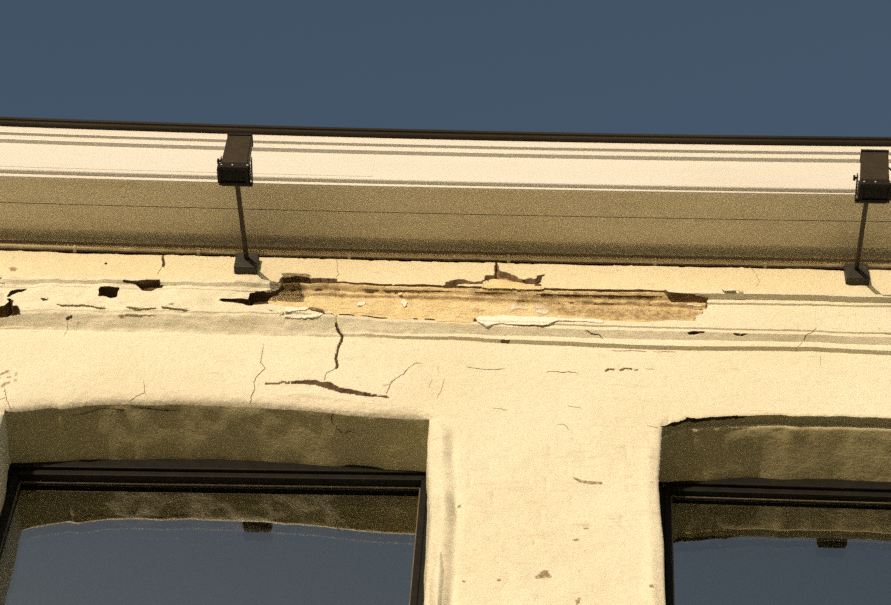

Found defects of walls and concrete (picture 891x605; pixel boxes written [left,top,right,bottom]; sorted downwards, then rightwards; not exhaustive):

spalling [250,268,706,327]
crack [325,315,343,375]
crack [73,385,179,416]
crack [652,415,745,428]